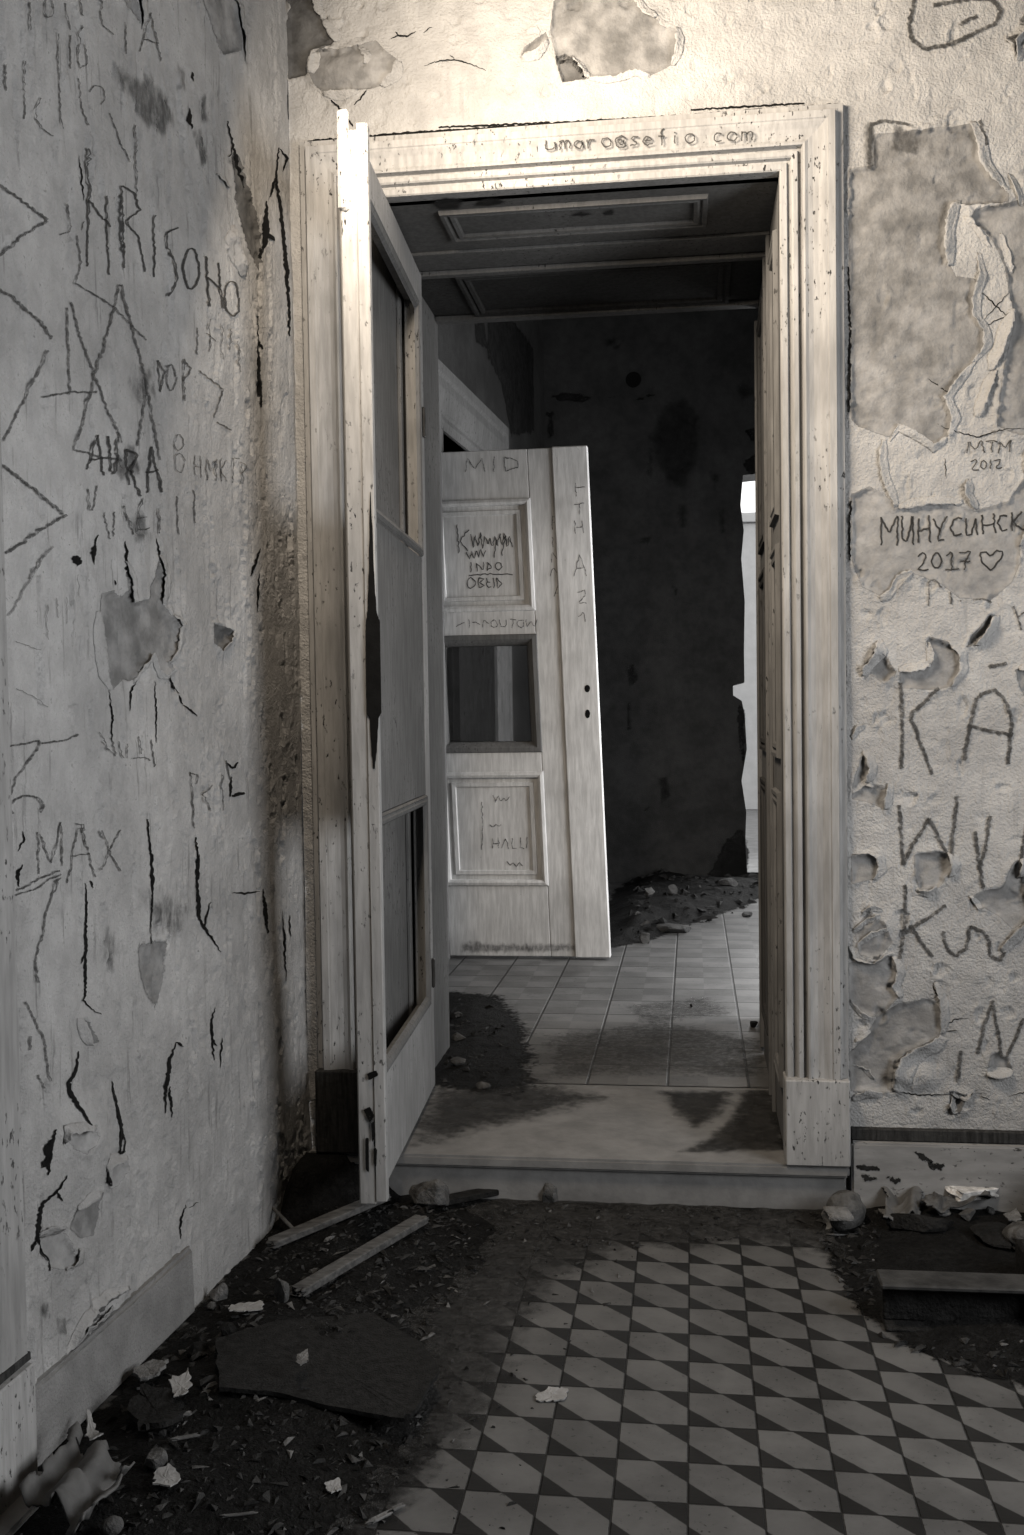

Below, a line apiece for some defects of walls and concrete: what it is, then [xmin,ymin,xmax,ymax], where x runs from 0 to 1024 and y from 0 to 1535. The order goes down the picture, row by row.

peeling [286,0,403,101]
peeling [520,0,685,84]
peeling [849,121,1024,694]
peeling [93,555,187,690]
peeling [851,724,894,810]
peeling [851,853,887,884]
peeling [914,851,961,897]
peeling [969,858,1024,953]
peeling [849,905,950,1102]
peeling [949,1089,975,1115]
peeling [986,1053,1014,1080]
peeling [39,1122,130,1271]